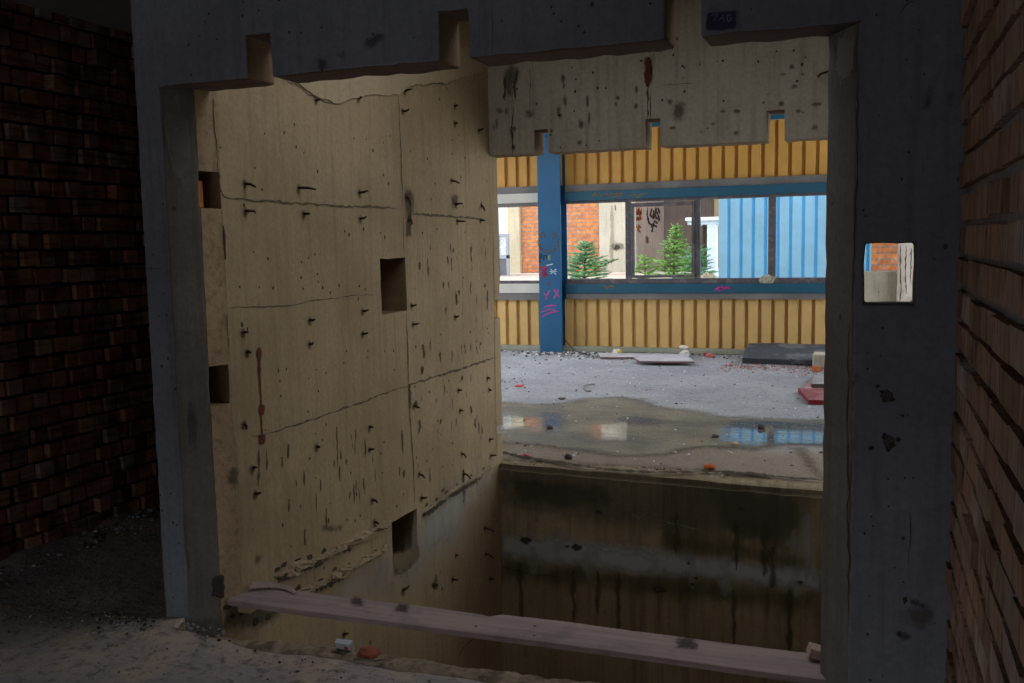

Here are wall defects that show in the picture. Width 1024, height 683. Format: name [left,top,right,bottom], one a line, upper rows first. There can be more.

crack [213,79,489,248]
corrosion [241,330,268,498]
crack [227,246,495,504]
spalling [211,575,798,683]
spalling [274,460,823,653]
water stain [503,512,819,651]